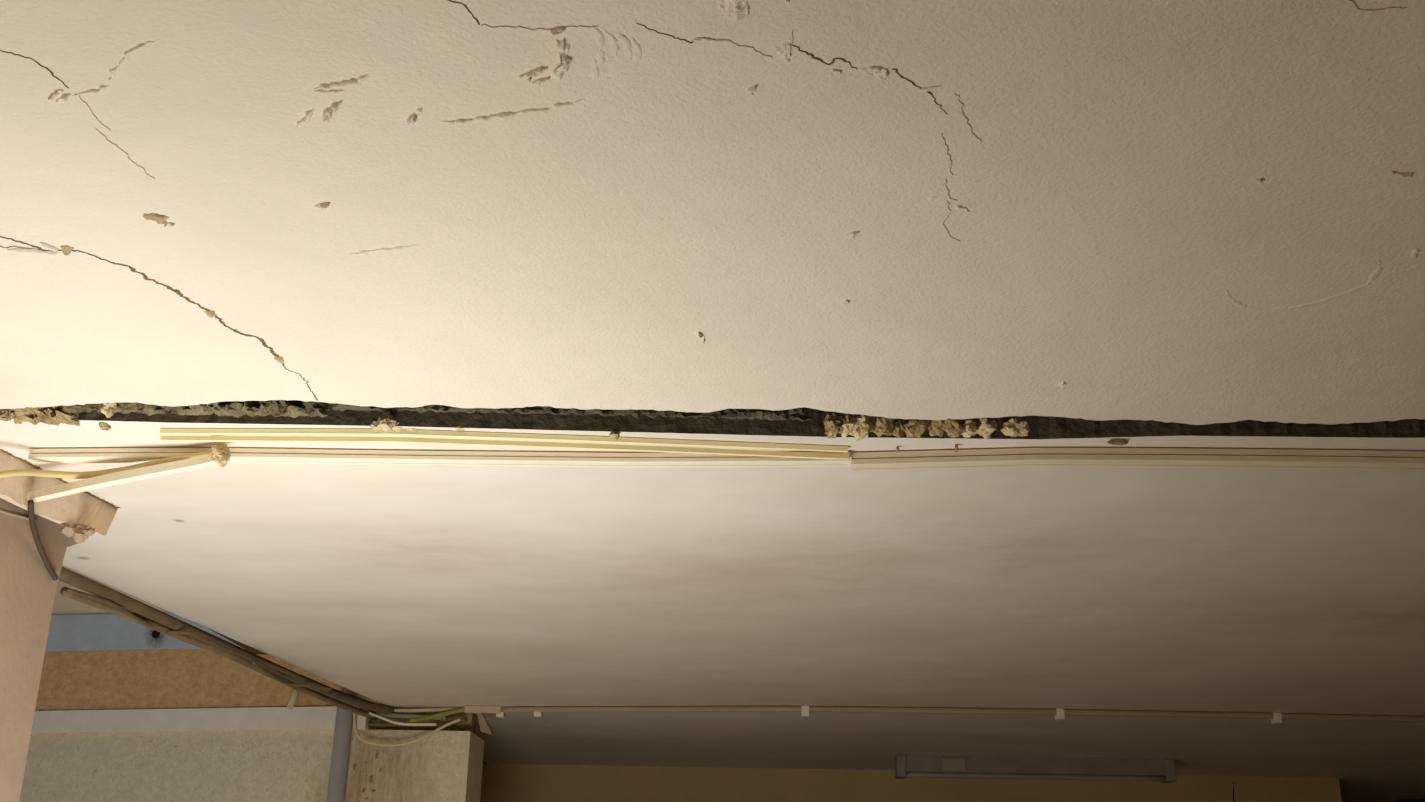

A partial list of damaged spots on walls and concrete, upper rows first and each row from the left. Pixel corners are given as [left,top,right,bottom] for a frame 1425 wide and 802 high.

crack [448,0,597,30]
crack [0,50,155,179]
crack [637,23,982,242]
crack [0,236,317,400]
crack [0,449,120,508]